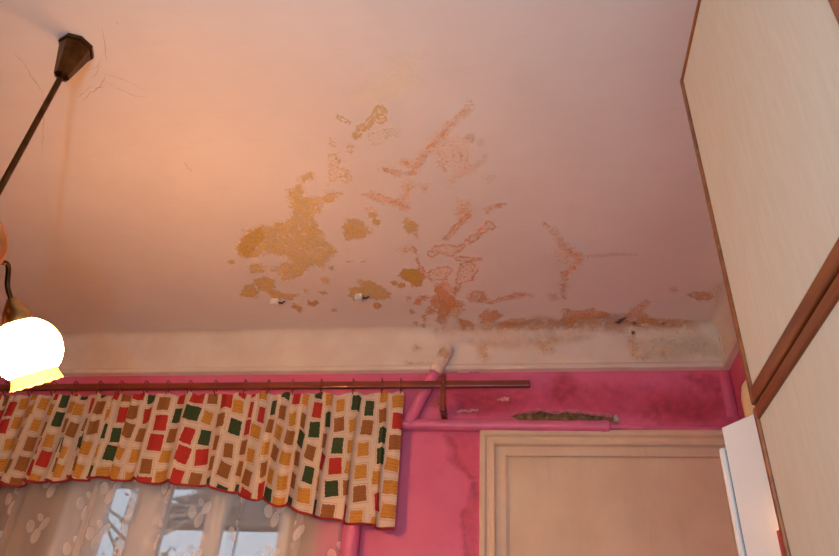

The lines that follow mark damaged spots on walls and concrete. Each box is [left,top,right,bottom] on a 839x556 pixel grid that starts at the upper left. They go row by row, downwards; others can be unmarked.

flaking render [511,408,619,423]